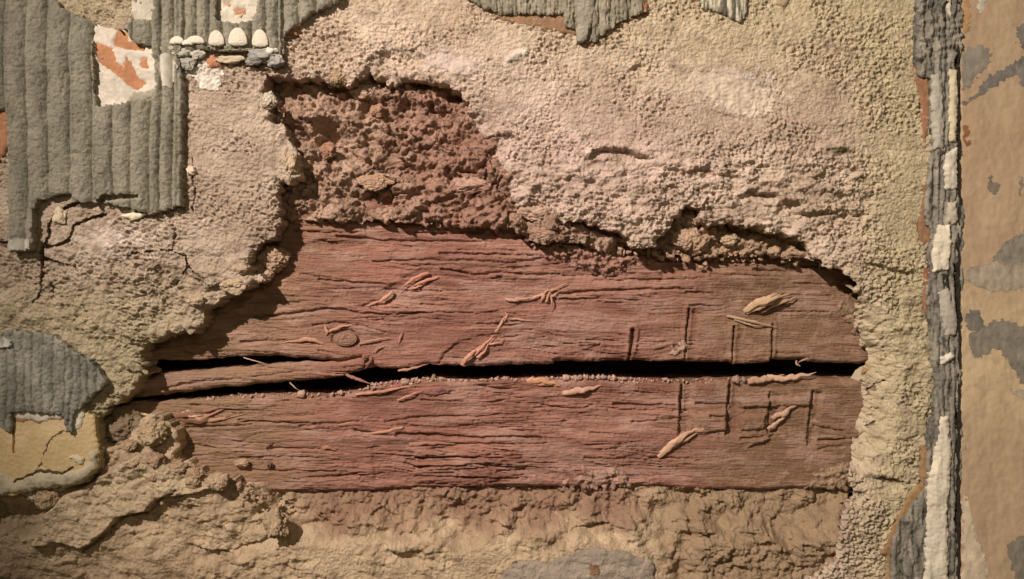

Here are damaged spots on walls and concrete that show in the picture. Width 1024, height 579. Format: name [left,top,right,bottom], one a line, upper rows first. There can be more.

peeling [0,0,340,253]
spalling [581,145,875,232]
crack [32,202,108,302]
crack [119,231,204,286]
spalling [172,269,204,293]
peeling [0,328,109,434]